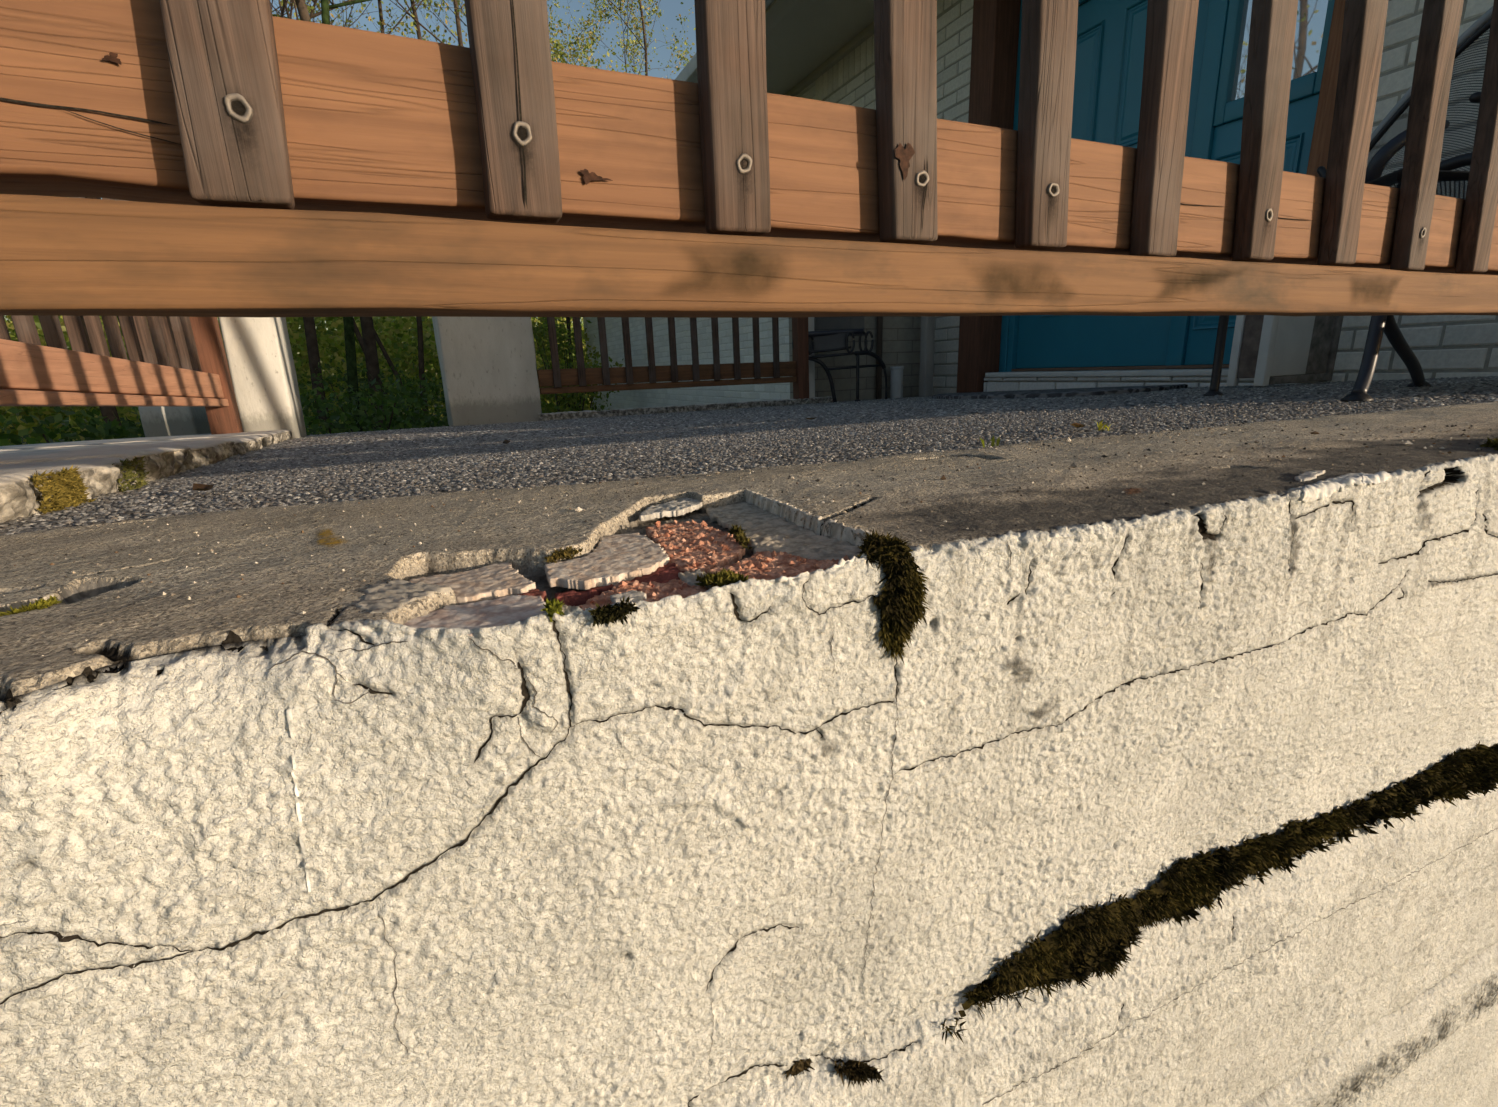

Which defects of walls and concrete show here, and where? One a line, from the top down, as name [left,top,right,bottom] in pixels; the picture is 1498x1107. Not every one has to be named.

spalling [0,576,142,613]
spalling [355,489,872,636]
crack [0,471,1498,1053]
crack [688,924,917,1107]
crack [981,828,1498,1107]